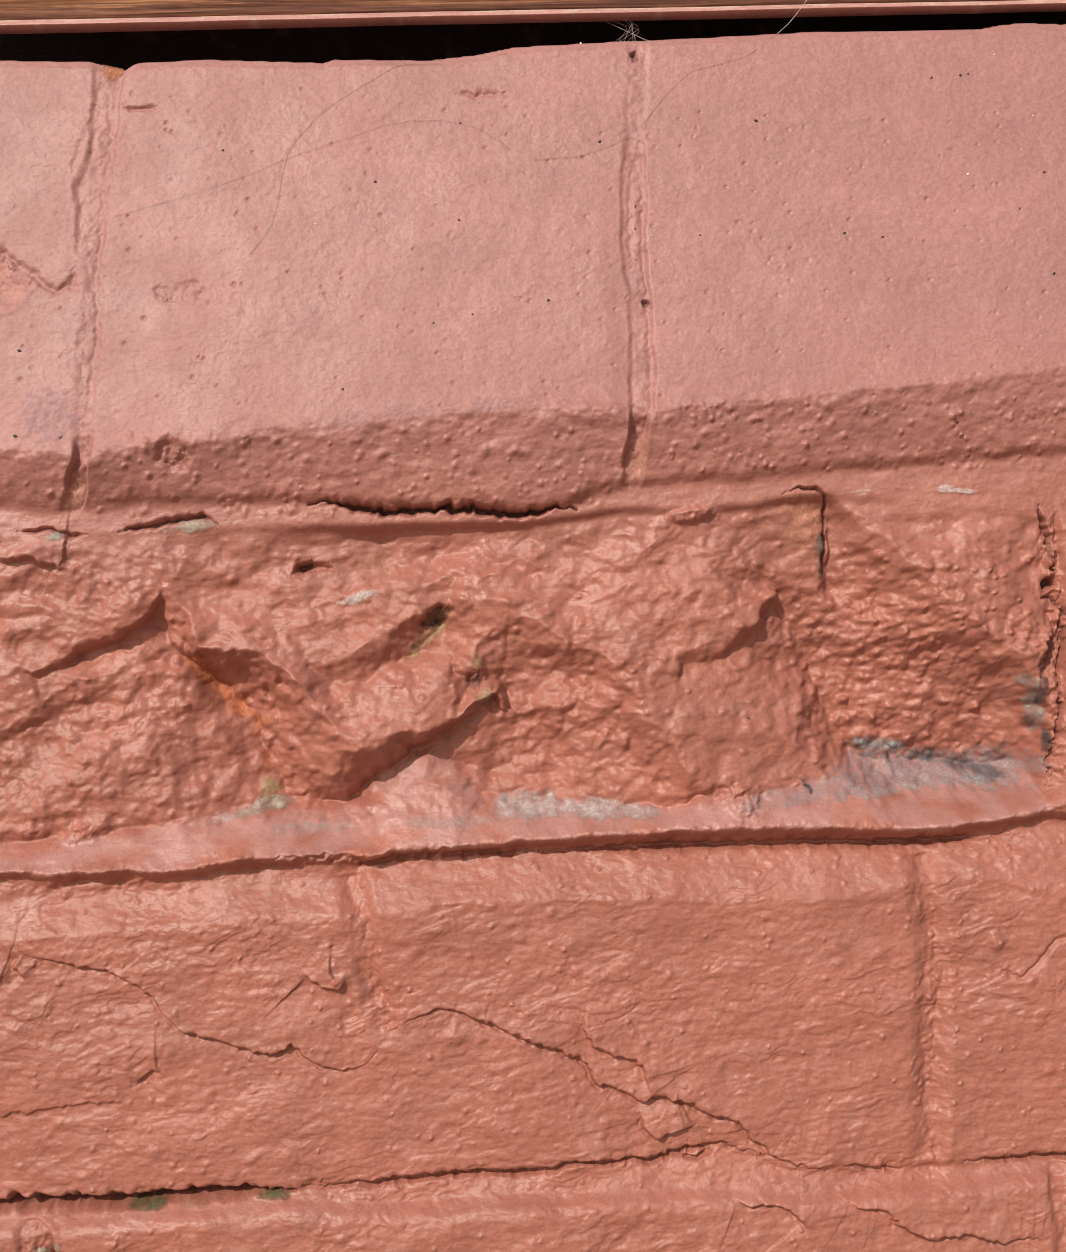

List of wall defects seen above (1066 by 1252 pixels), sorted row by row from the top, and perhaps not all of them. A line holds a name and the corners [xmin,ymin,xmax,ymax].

peeling [0,243,82,300]
crack [0,510,223,576]
crack [304,494,581,523]
crack [779,482,832,589]
crack [1034,501,1066,796]
water stain [786,676,1051,805]
crack [990,933,1066,984]
crack [0,945,1066,1249]